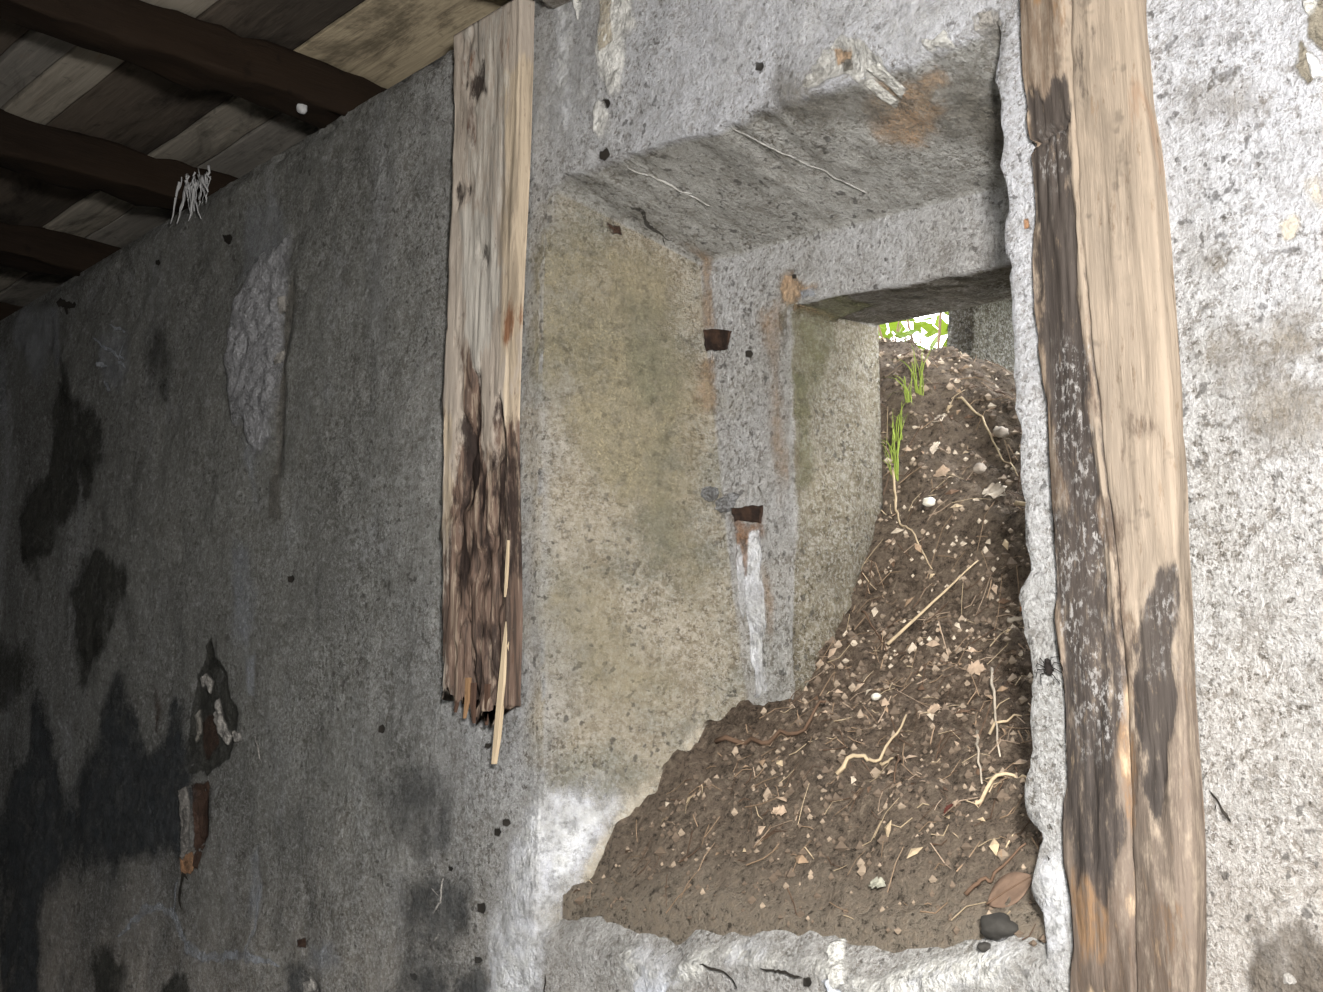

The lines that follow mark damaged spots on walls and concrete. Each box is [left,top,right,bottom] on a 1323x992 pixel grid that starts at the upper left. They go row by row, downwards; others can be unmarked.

peeling [555,0,636,161]
spalling [803,35,937,142]
spalling [1294,0,1323,84]
water stain [19,364,102,568]
peeling [185,639,242,776]
water stain [685,730,702,751]
water stain [0,677,193,992]
water stain [127,903,309,992]
water stain [404,777,661,992]